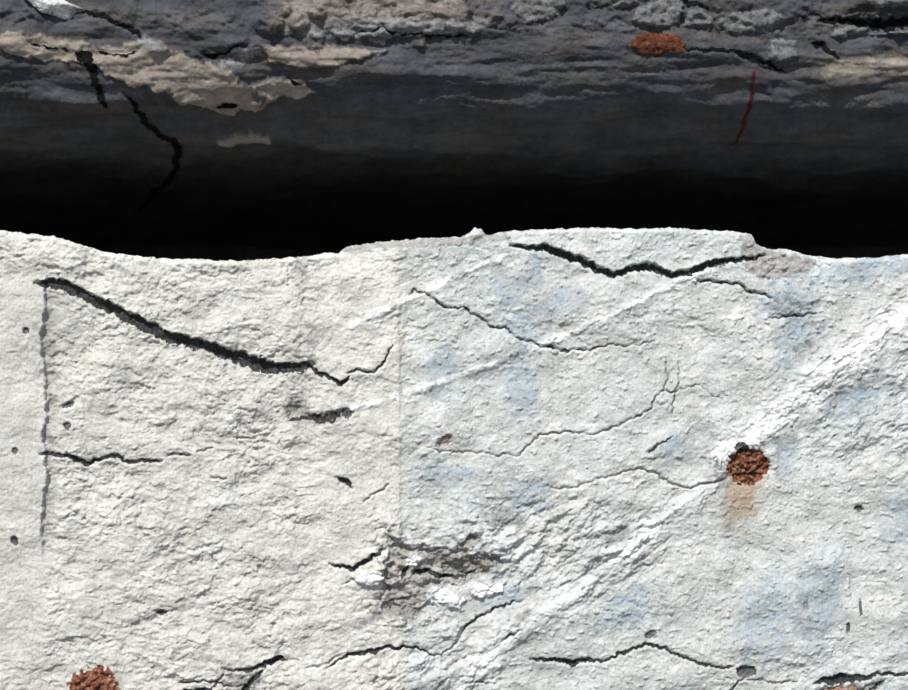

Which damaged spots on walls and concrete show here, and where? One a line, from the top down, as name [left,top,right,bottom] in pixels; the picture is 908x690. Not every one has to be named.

peeling [0,31,315,117]
spalling [264,0,500,68]
peeling [510,0,566,23]
corrosion [625,31,686,57]
crack [510,244,814,319]
crack [36,277,393,386]
crack [410,288,652,353]
crack [40,447,213,467]
corrosion [725,448,770,518]
corrosion [66,662,119,690]
crack [180,600,522,690]
crack [532,642,908,690]